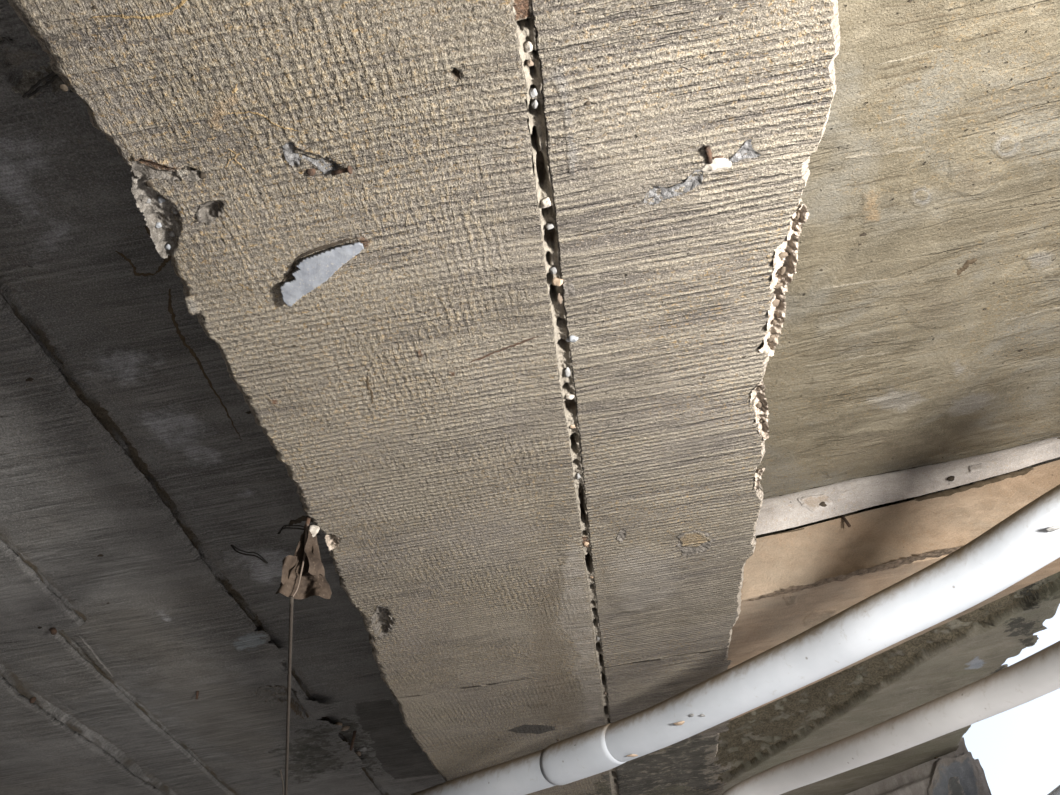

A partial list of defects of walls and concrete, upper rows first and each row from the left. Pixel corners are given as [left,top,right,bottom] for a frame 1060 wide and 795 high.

spalling [131,151,206,259]
spalling [196,201,224,225]
spalling [643,169,703,205]
peeling [279,234,373,307]
spalling [759,204,809,357]
crack [115,251,243,441]
crack [469,0,610,725]
spalling [750,381,770,441]
spalling [754,468,765,490]
spalling [325,534,339,551]
spalling [371,605,394,639]
crack [610,768,618,795]